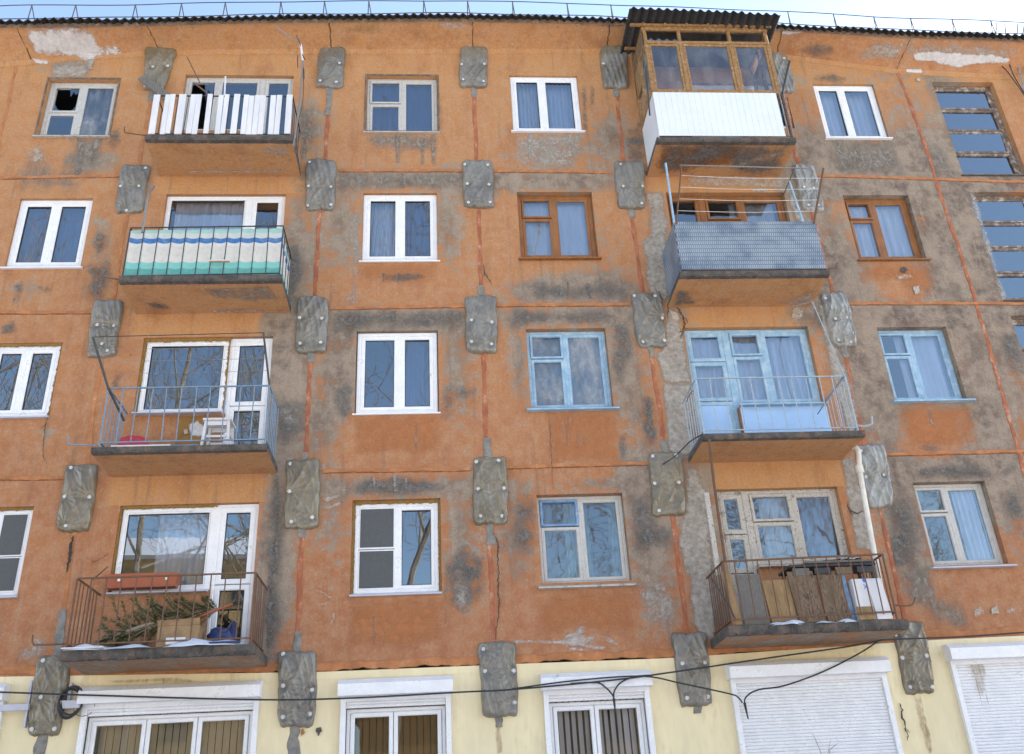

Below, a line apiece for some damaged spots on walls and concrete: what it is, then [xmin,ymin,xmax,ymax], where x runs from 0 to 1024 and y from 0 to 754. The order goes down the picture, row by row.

peeling [29,27,121,77]
peeling [906,51,1009,82]
water stain [372,135,436,164]
crack [66,536,108,572]
flaking render [679,468,718,640]
crack [492,533,500,640]
peeling [553,628,616,651]
crack [899,703,909,740]